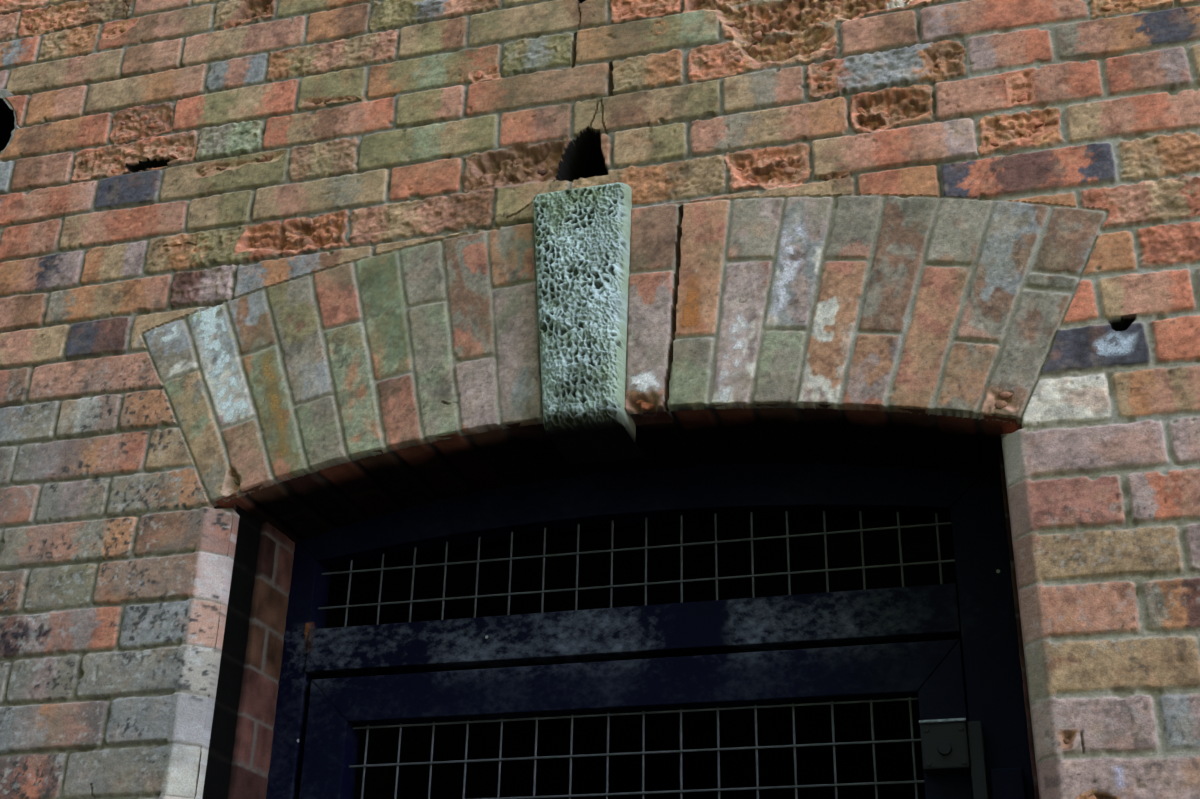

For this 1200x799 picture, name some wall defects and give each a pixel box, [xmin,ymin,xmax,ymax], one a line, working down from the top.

spalling [71,104,286,183]
spalling [462,135,572,193]
crack [570,3,582,69]
crack [589,61,614,135]
spalling [610,0,934,102]
spalling [723,145,851,192]
spalling [848,41,967,134]
spalling [977,69,1062,155]
spalling [1089,0,1200,20]
spalling [234,210,350,257]
crack [664,204,684,420]